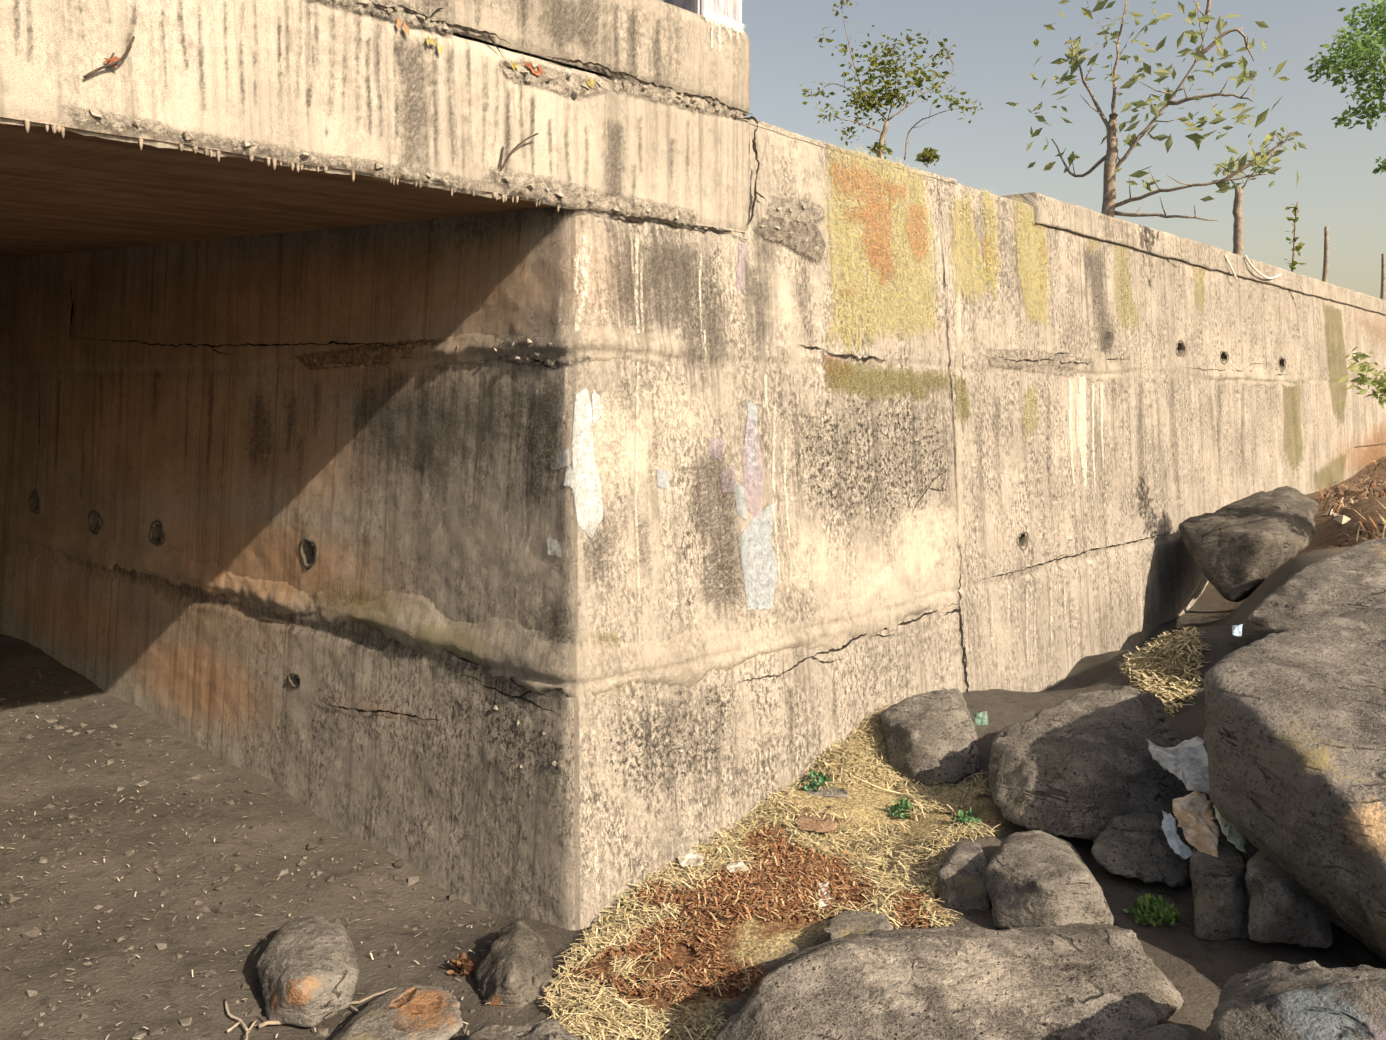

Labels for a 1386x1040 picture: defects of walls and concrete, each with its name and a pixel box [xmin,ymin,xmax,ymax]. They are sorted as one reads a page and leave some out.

spalling [64,107,697,227]
crack [543,56,766,240]
crack [70,279,447,355]
damp [559,236,589,332]
damp [1087,240,1113,360]
damp [1324,305,1349,423]
damp [506,368,567,541]
crack [731,179,1171,692]
damp [1069,376,1104,486]
damp [1313,453,1347,490]
crack [438,651,562,713]